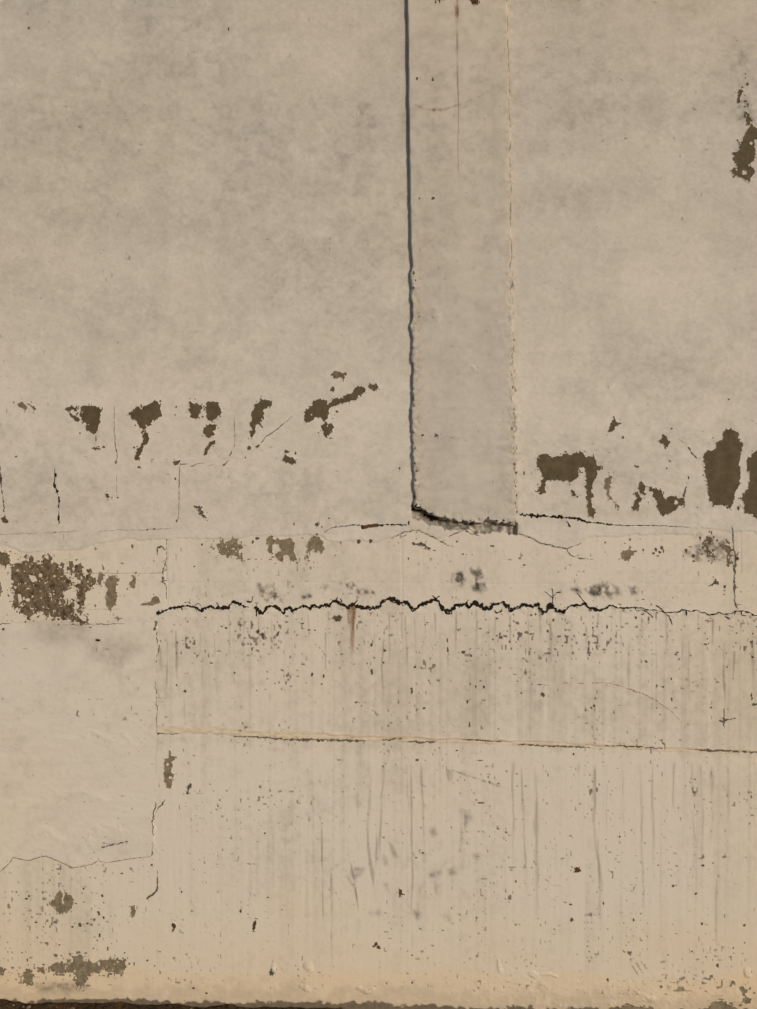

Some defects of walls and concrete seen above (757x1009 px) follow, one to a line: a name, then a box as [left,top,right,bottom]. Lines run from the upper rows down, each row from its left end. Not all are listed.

peeling [730,73,757,184]
peeling [126,398,225,468]
peeling [303,370,380,439]
peeling [470,449,689,523]
peeling [702,427,757,519]
peeling [0,549,139,628]
crack [0,417,757,735]
crack [233,736,436,744]
crack [463,739,662,749]
crack [695,747,757,755]
crack [1,799,165,899]
peeling [0,937,155,992]